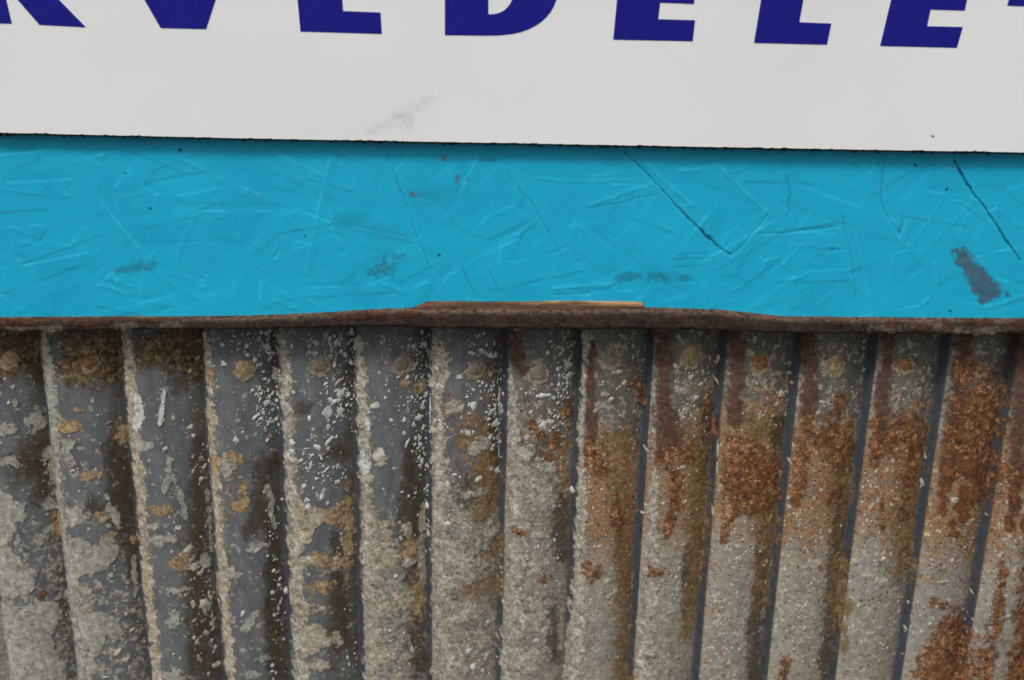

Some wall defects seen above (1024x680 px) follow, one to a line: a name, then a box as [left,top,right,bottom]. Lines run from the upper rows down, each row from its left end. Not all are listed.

rust [0,316,181,326]
damp [0,328,208,394]
damp [87,436,139,576]
damp [188,435,221,680]
damp [242,455,286,680]
damp [329,532,348,648]
damp [398,440,431,677]
rust [580,342,634,680]
rust [625,329,854,654]
rust [868,320,931,583]
rust [909,548,1024,680]
rust [937,318,1024,537]